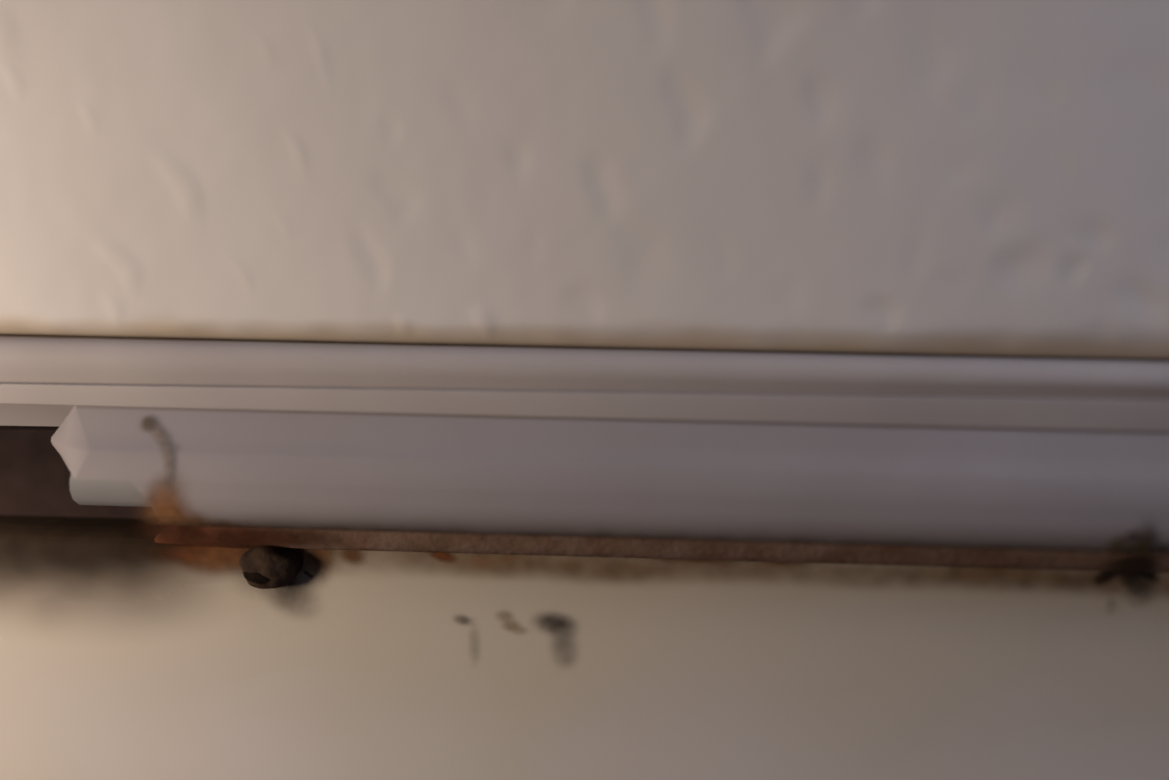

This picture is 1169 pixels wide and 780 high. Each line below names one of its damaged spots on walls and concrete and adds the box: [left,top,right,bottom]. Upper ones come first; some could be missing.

damp [543,617,565,629]